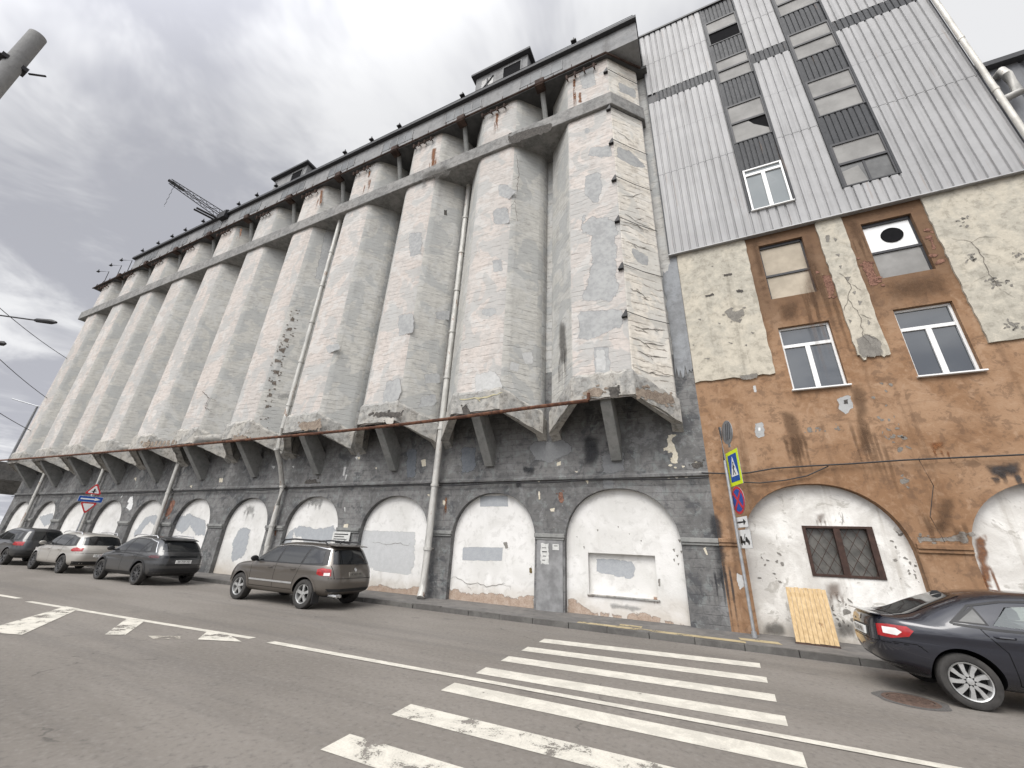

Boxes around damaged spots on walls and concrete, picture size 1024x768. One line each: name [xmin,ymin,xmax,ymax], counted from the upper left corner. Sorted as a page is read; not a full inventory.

crack [623,193,652,251]
crack [952,236,1010,295]
spalling [260,310,300,428]
peeling [578,215,623,398]
crack [632,325,670,377]
peeling [718,307,746,324]
crack [839,273,875,345]
peeling [857,320,882,357]
peeling [663,434,707,479]
leakage [991,464,1022,485]